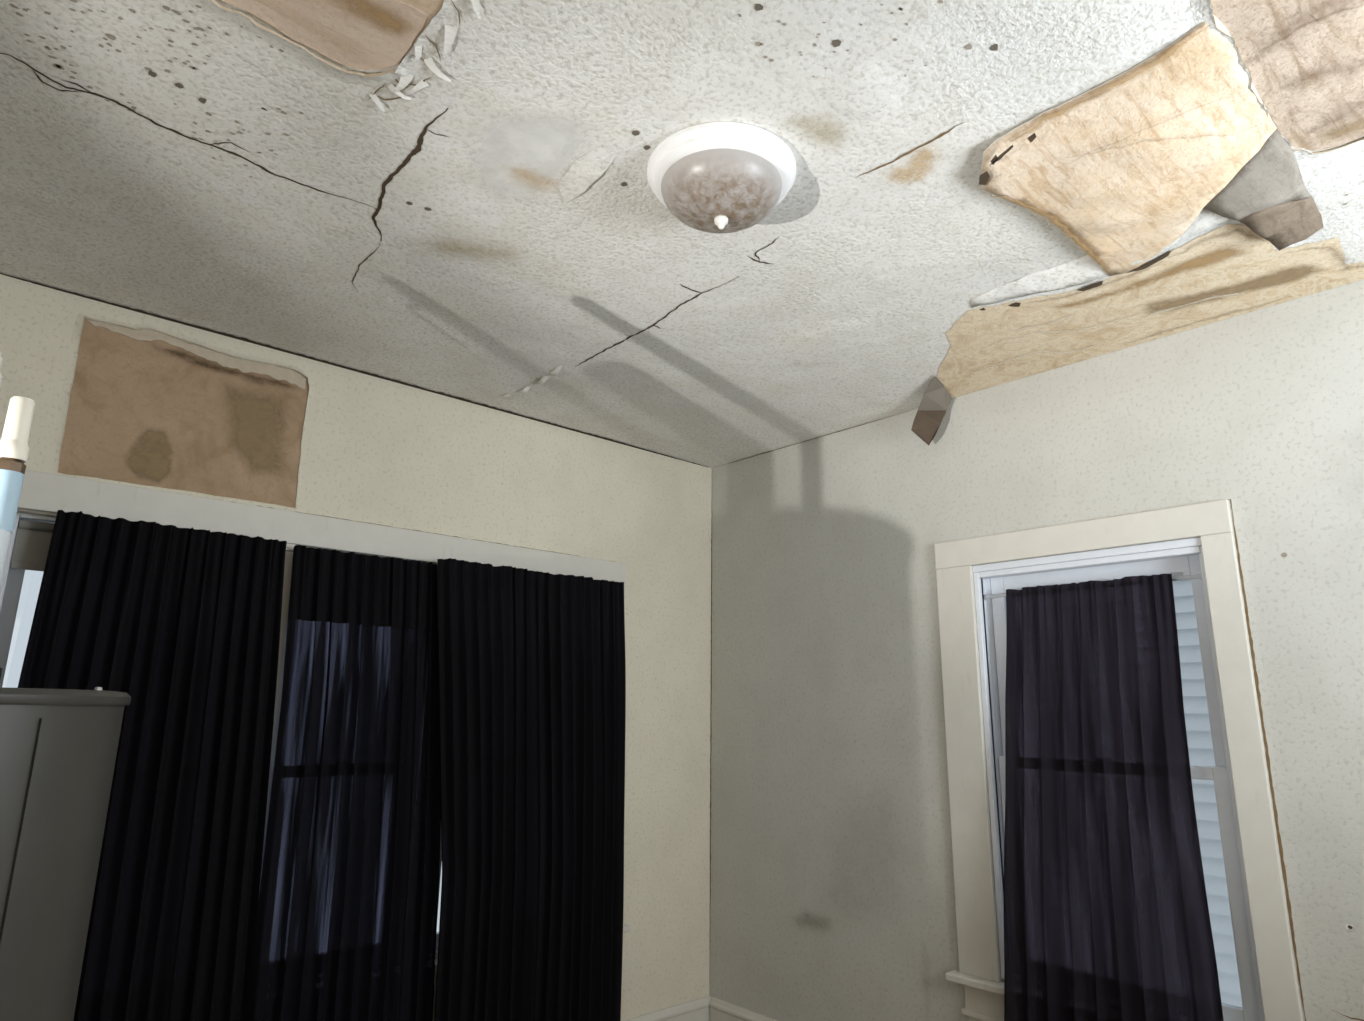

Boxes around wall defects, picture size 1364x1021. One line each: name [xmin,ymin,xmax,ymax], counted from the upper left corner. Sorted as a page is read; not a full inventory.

crack [0,53,450,292]
peeling [190,0,481,112]
peeling [911,0,1364,446]
crack [0,237,905,467]